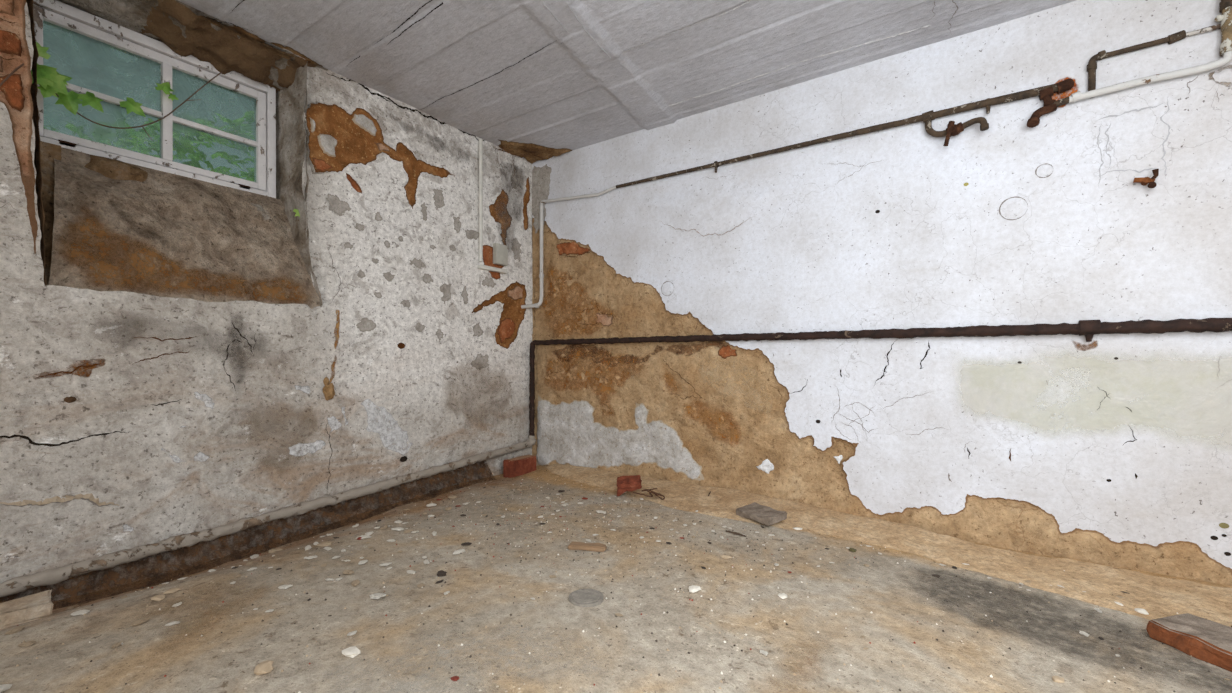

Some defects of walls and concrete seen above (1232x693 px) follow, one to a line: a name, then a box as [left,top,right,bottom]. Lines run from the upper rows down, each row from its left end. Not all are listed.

corrosion [1051,77,1078,107]
flaking render [0,0,38,253]
crack [133,336,200,364]
crack [223,323,256,391]
spalling [305,103,1232,585]
crack [832,340,930,440]
crack [0,428,132,447]